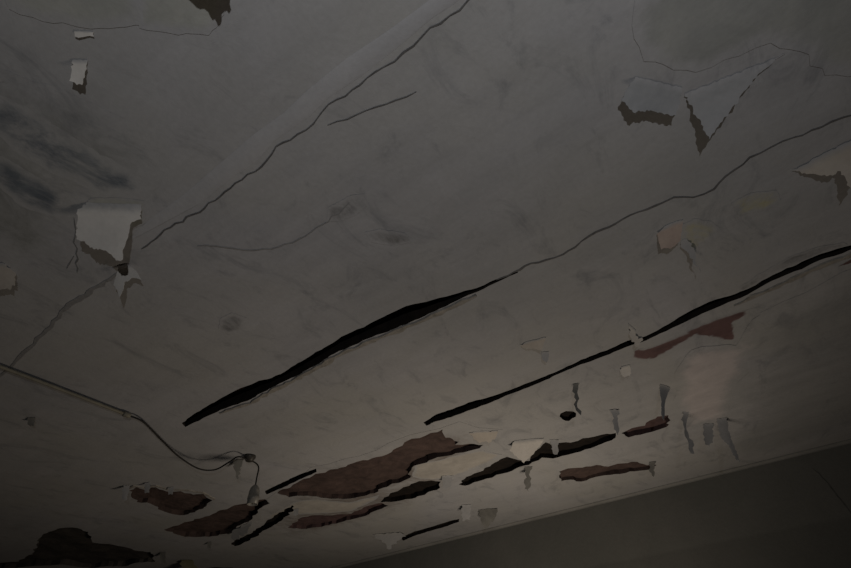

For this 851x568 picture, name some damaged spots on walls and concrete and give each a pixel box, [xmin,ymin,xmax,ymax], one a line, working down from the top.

peeling [139,0,228,35]
peeling [69,60,88,85]
peeling [621,54,784,139]
peeling [793,141,851,187]
peeling [76,198,146,297]
flaking render [122,245,851,549]